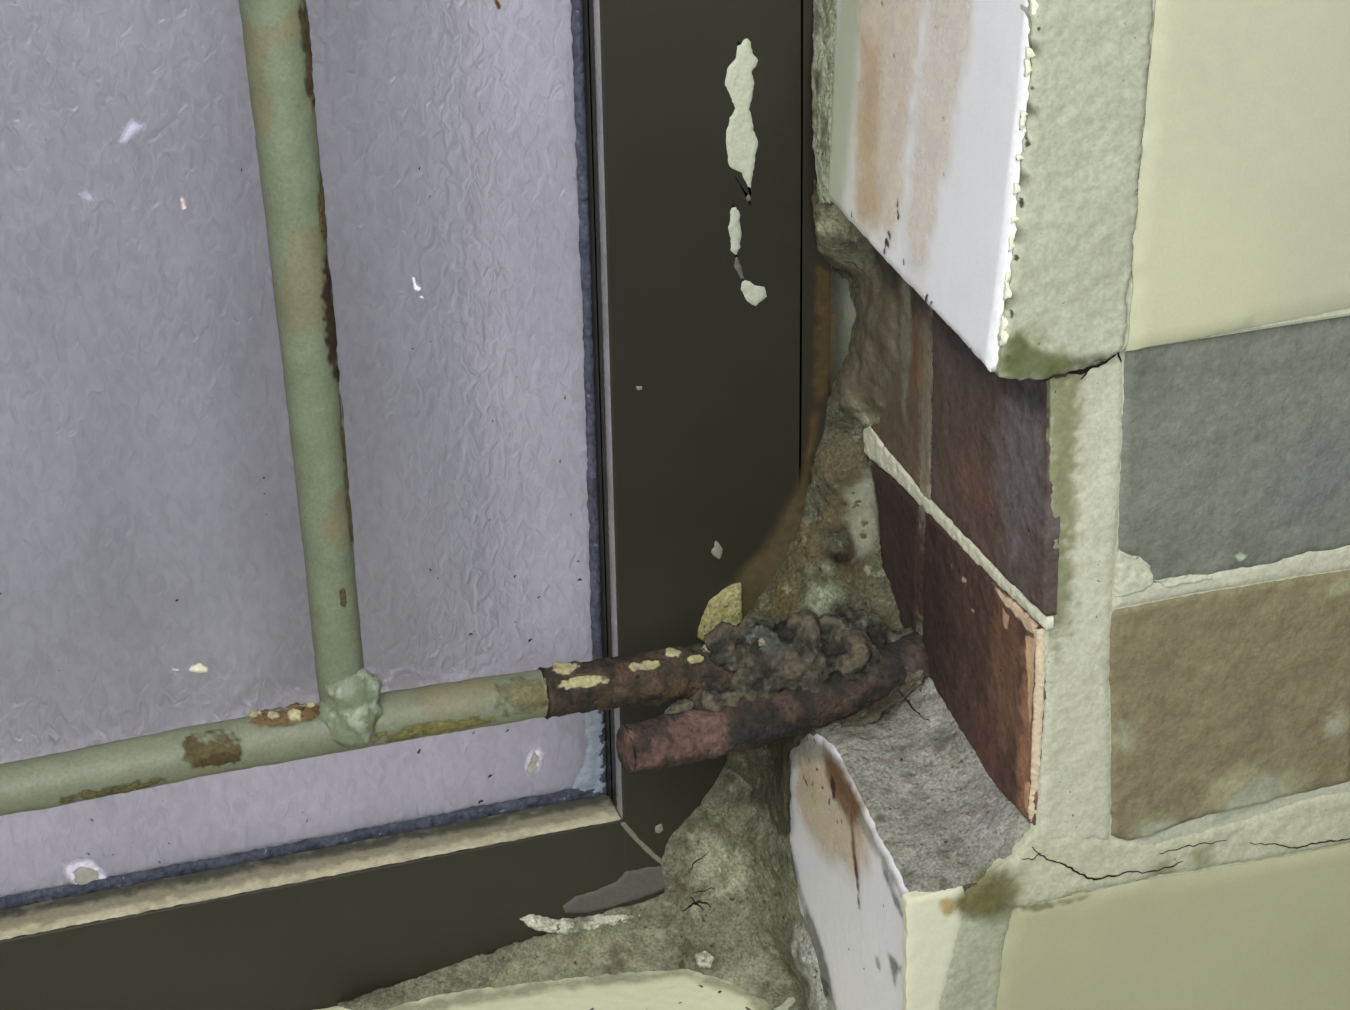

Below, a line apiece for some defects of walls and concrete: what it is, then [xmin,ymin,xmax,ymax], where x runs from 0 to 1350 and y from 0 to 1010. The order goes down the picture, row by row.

corrosion [664,414,925,714]
peeling [629,644,710,672]
crack [1023,838,1350,880]